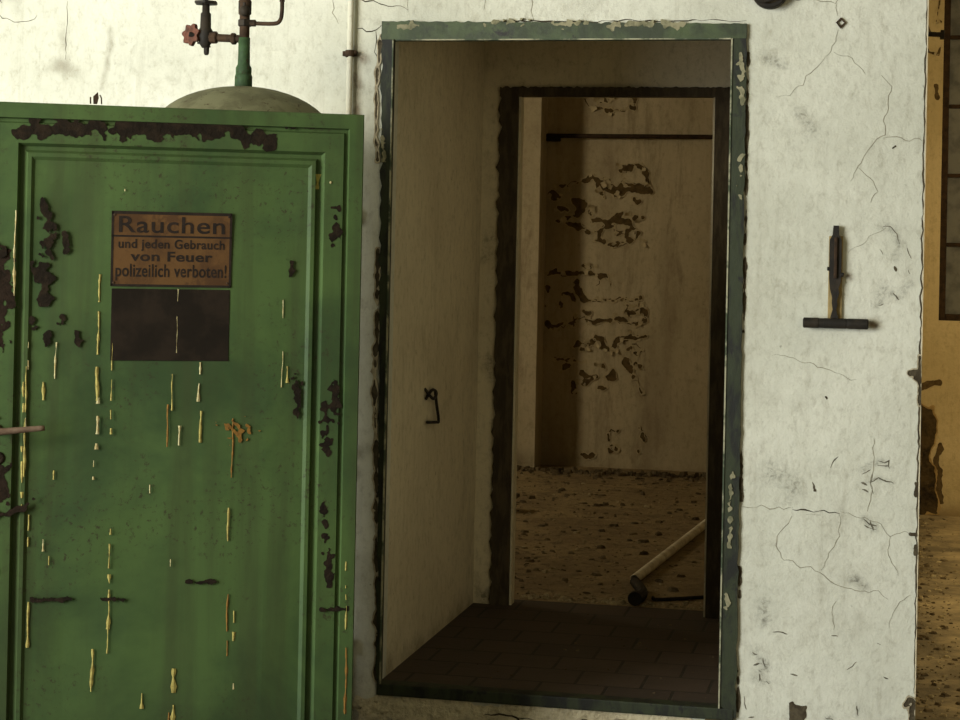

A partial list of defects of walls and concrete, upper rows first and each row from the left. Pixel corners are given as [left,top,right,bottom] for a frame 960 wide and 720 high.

crack [332,0,408,56]
crack [779,0,922,201]
peeling [546,162,655,249]
flaking render [736,52,750,333]
peeling [544,262,649,395]
crack [775,354,855,380]
flaking render [907,354,944,515]
flaking render [727,450,744,549]
crack [742,442,910,624]
flaking render [723,566,742,610]
crack [485,712,532,720]
flaking render [789,701,807,720]